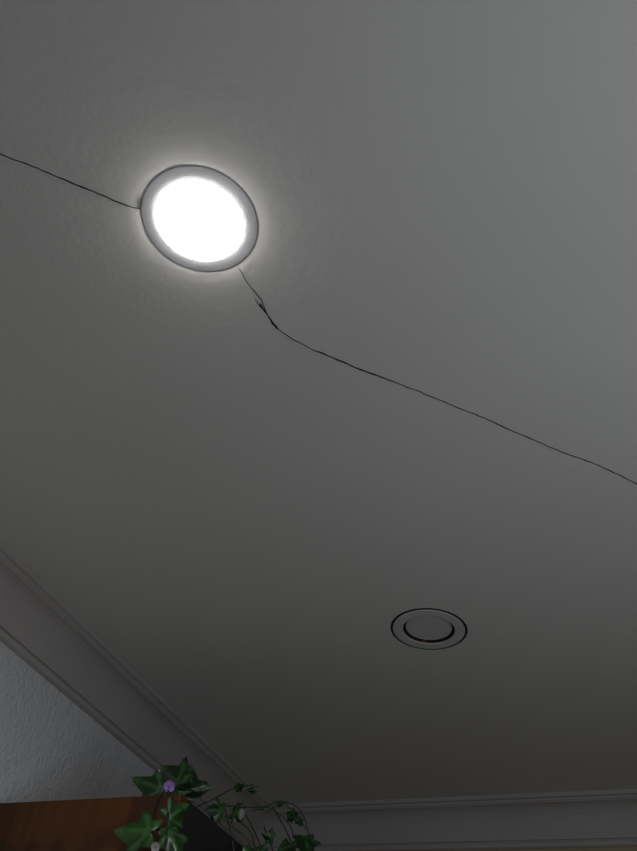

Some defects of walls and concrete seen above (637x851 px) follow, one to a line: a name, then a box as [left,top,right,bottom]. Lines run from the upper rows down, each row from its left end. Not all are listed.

crack [0,153,140,209]
crack [239,269,637,484]